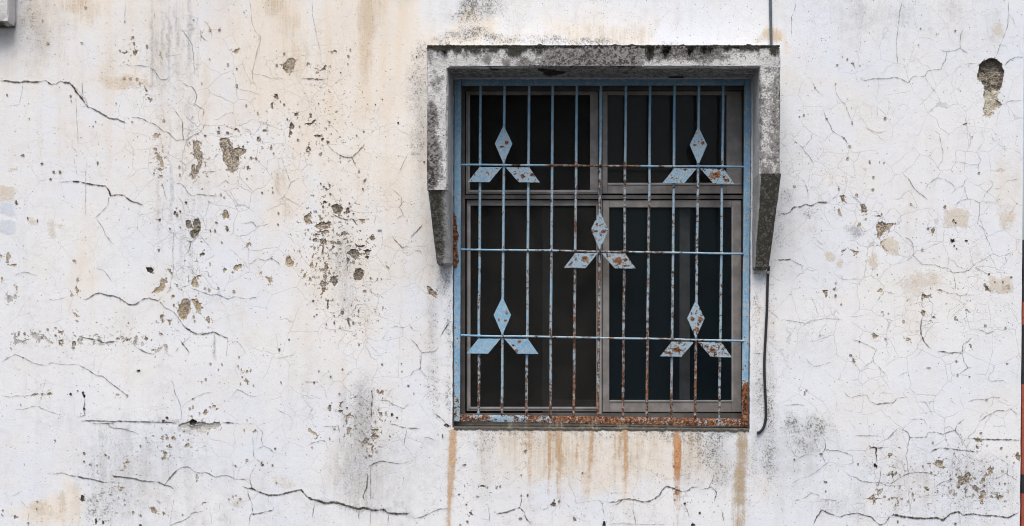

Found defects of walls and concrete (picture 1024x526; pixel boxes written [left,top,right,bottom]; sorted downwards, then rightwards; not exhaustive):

crack [3,64,204,141]
water stain [409,0,730,186]
spalling [978,58,1004,74]
spalling [178,127,273,179]
spalling [158,193,229,243]
spalling [303,183,390,327]
crack [87,269,227,350]
crack [56,390,446,520]
corrosion [447,429,457,526]
corrosion [614,430,628,479]
corrosion [674,431,682,494]
crack [795,380,1016,525]